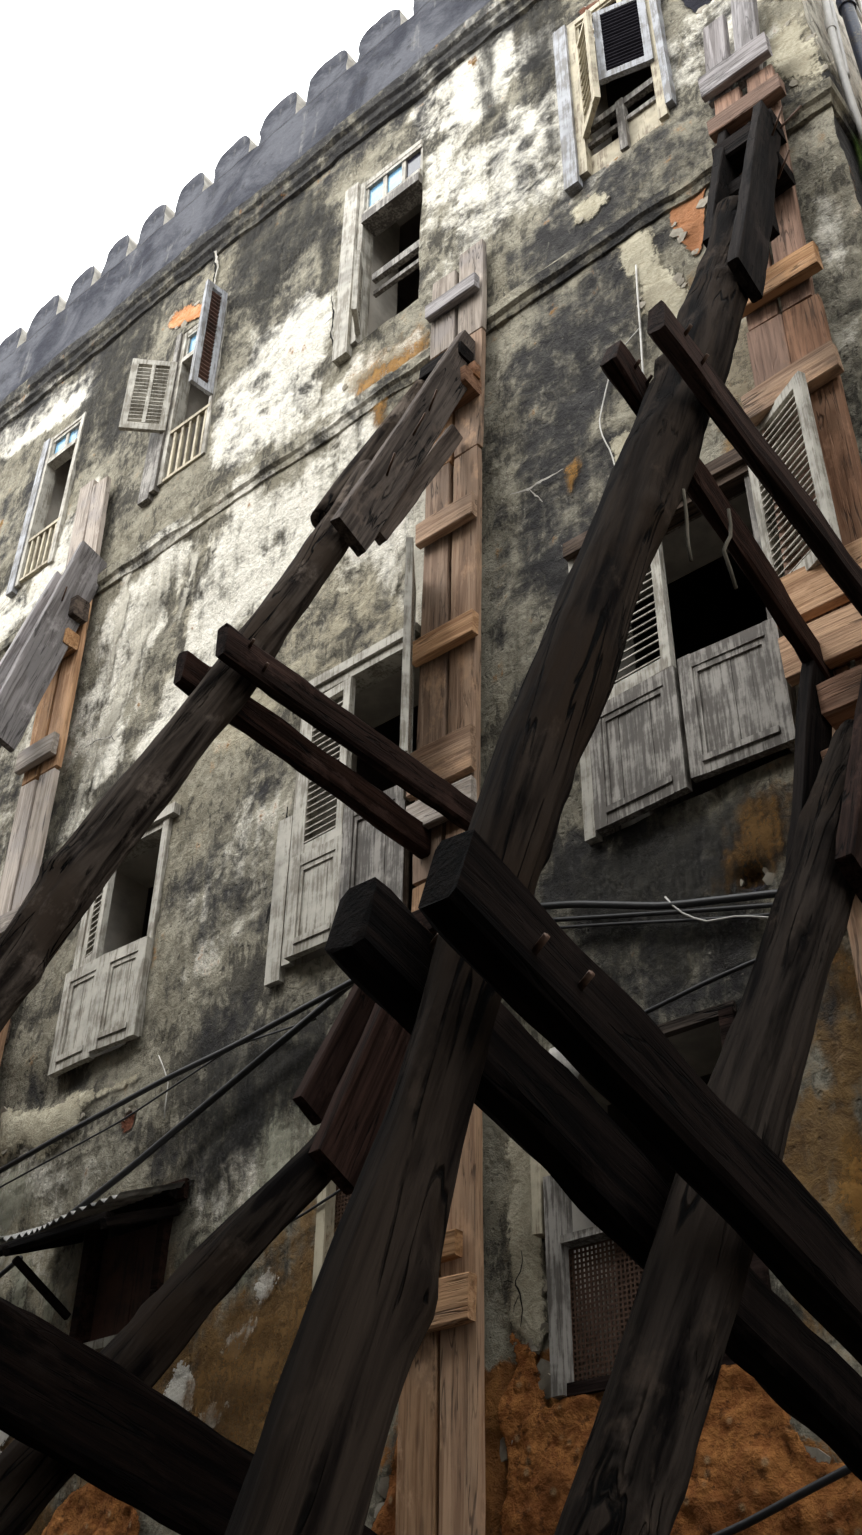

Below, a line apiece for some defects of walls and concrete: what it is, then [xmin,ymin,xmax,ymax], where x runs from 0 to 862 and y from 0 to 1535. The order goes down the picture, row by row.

spalling [682,0,711,14]
damp [472,35,497,124]
damp [513,0,566,153]
spalling [168,300,202,330]
damp [229,183,337,353]
peeling [616,188,708,318]
damp [391,489,426,623]
damp [193,978,345,1202]
spalling [497,1133,601,1535]
spalling [41,1483,140,1535]
spalling [670,1364,862,1535]